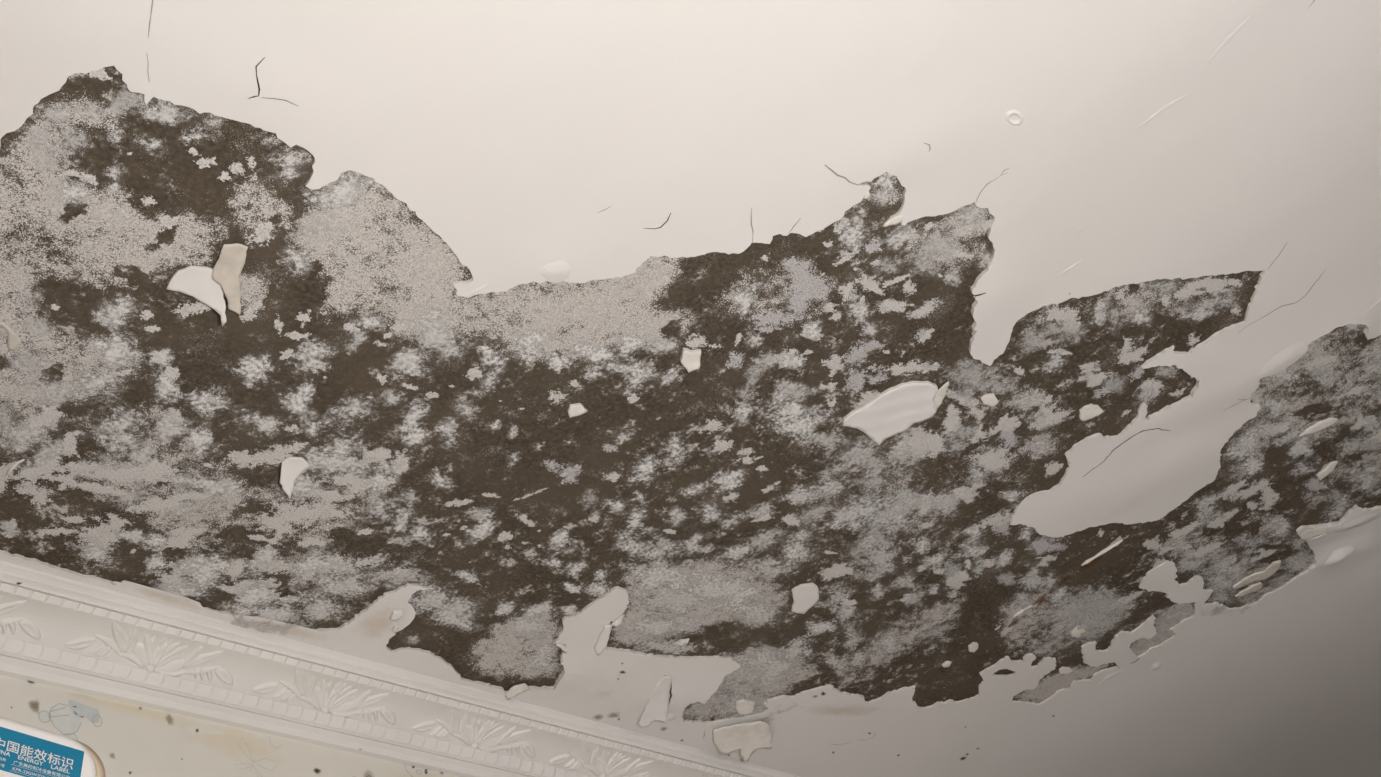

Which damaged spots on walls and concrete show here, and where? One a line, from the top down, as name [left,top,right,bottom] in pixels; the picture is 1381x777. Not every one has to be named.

peeling [212,243,248,315]
spalling [680,347,701,373]
spalling [568,403,588,418]
spalling [1298,418,1338,437]
peeling [280,457,310,499]
spalling [1316,461,1337,481]
spalling [1232,560,1281,589]
leakage [113,581,416,644]
peeling [713,704,802,761]